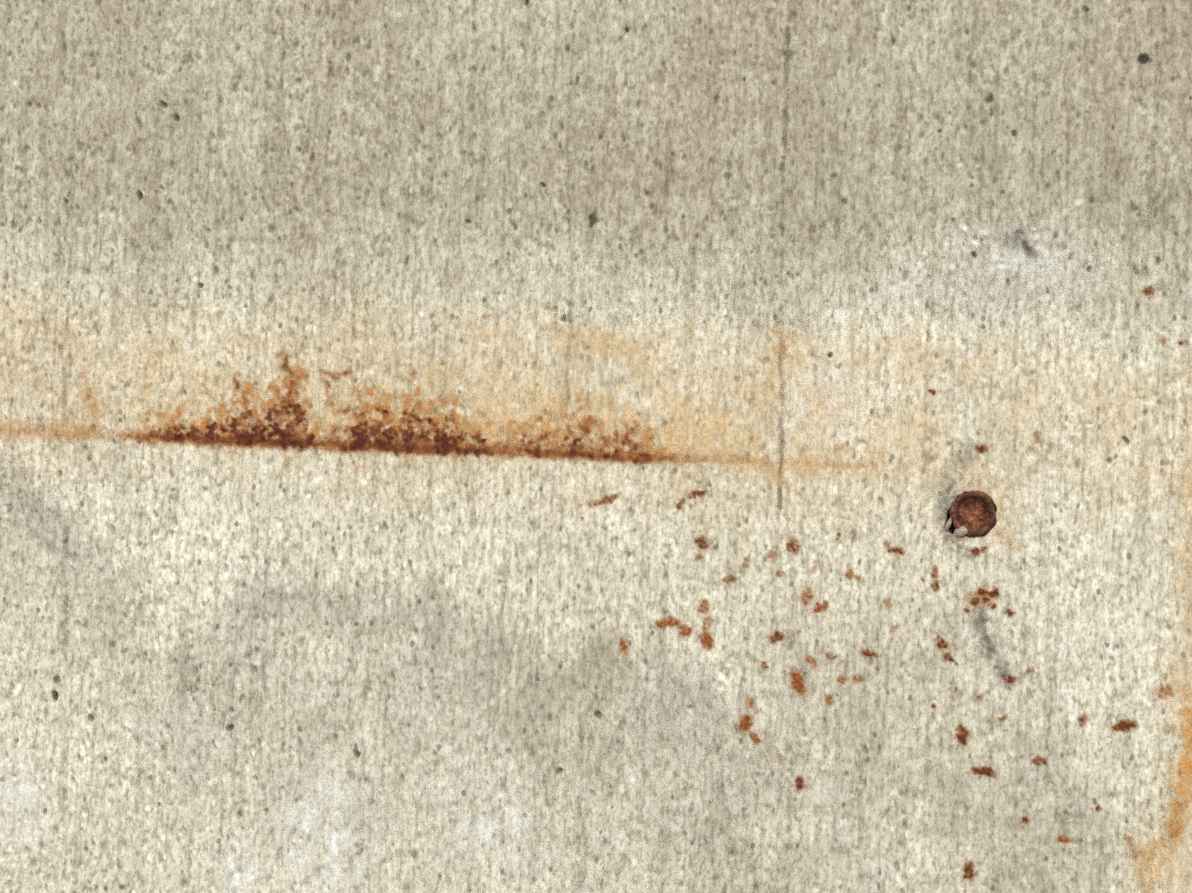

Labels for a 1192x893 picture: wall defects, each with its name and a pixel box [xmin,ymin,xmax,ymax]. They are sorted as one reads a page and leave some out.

corrosion [120,353,770,469]
corrosion [1159,685,1173,698]
corrosion [1167,707,1192,837]